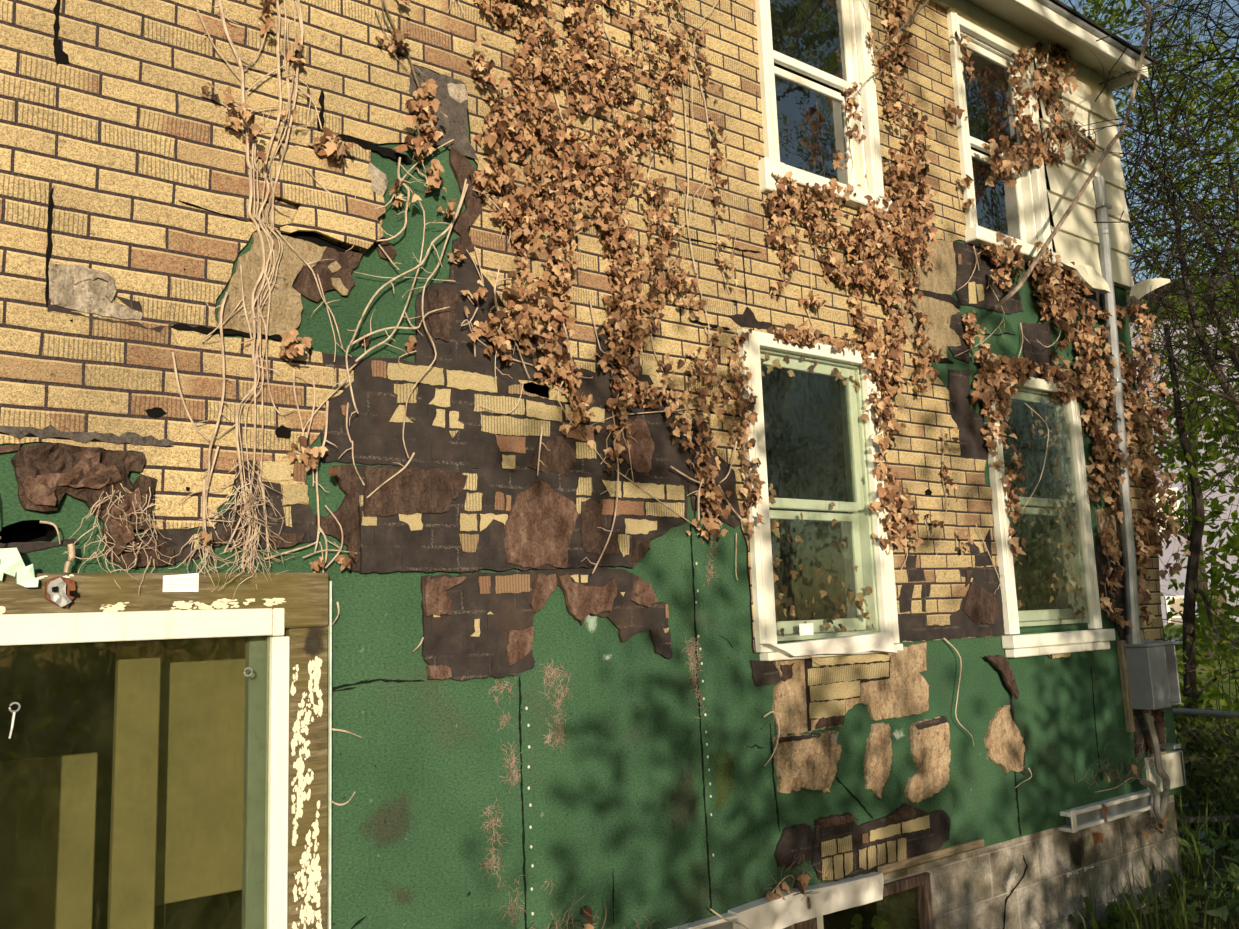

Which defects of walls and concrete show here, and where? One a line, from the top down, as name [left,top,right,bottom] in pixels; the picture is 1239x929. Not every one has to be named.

peeling [408,66,478,160]
peeling [898,238,984,364]
peeling [371,360,605,469]
peeling [259,461,309,527]
peeling [459,473,511,552]
peeling [576,477,685,557]
peeling [36,574,74,607]
crack [332,678,424,692]
peeling [807,652,891,719]
peeling [290,656,323,929]
peeling [820,815,930,881]
crack [1003,855,1028,929]